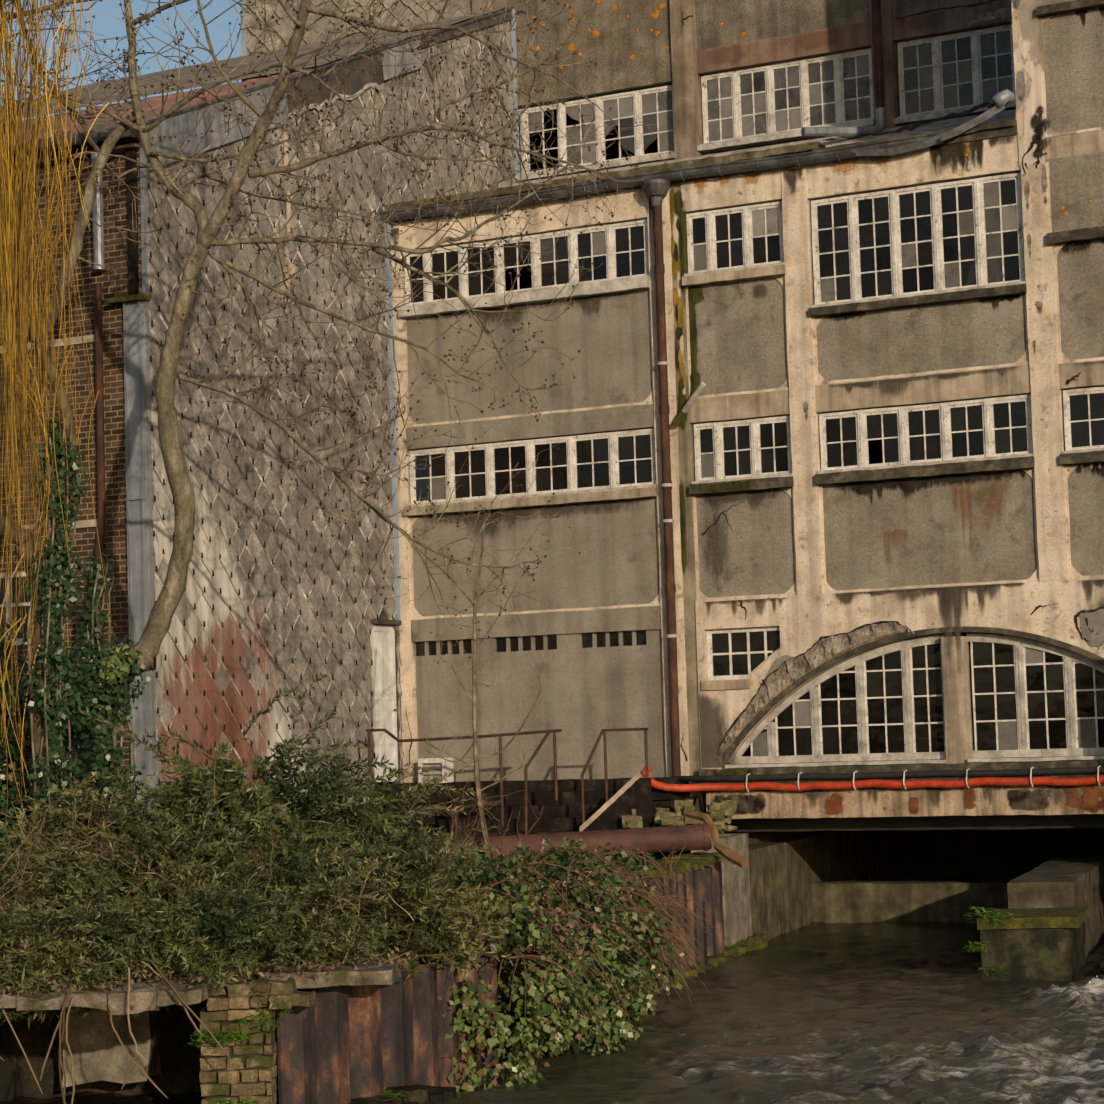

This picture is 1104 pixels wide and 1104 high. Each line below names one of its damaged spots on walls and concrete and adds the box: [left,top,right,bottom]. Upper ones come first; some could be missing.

damp [834,158,858,173]
damp [871,156,890,166]
damp [929,135,1014,171]
damp [695,176,729,190]
damp [744,171,761,184]
damp [669,189,704,429]
crack [702,499,746,536]
spalling [1074,607,1104,647]
spalling [714,794,766,814]
spalling [1007,789,1051,810]